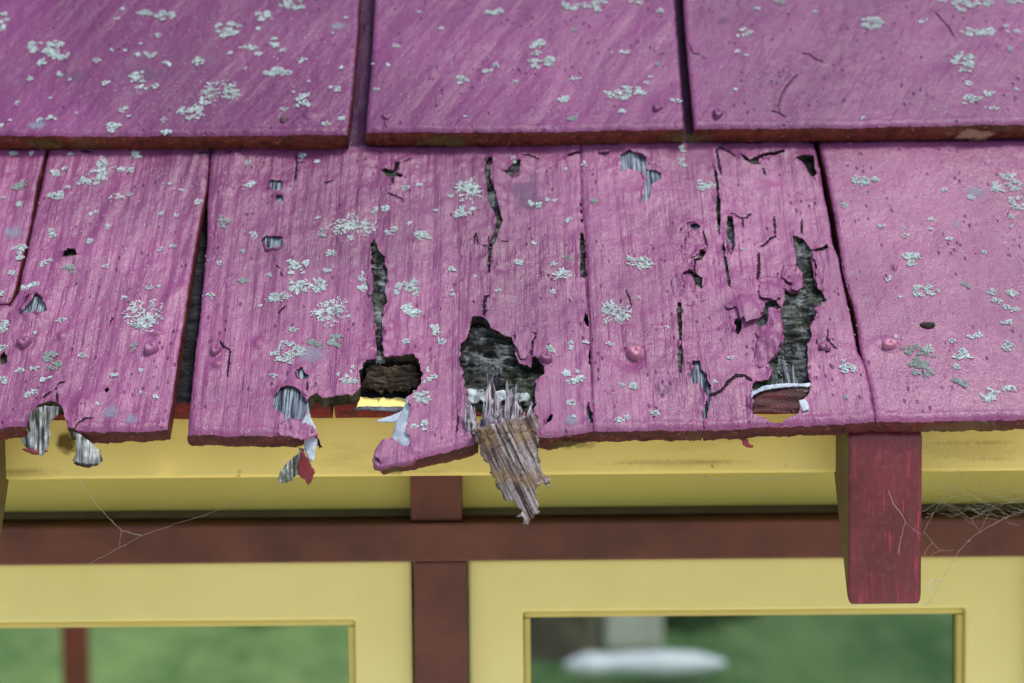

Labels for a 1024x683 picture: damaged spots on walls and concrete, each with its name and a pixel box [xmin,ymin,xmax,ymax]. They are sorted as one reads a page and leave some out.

peeling [620,151,661,202]
peeling [684,225,707,287]
peeling [513,325,533,360]
peeling [724,250,825,414]
peeling [21,406,59,456]
peeling [72,431,103,468]
peeling [273,369,318,485]
peeling [372,396,416,471]
peeling [689,360,710,435]